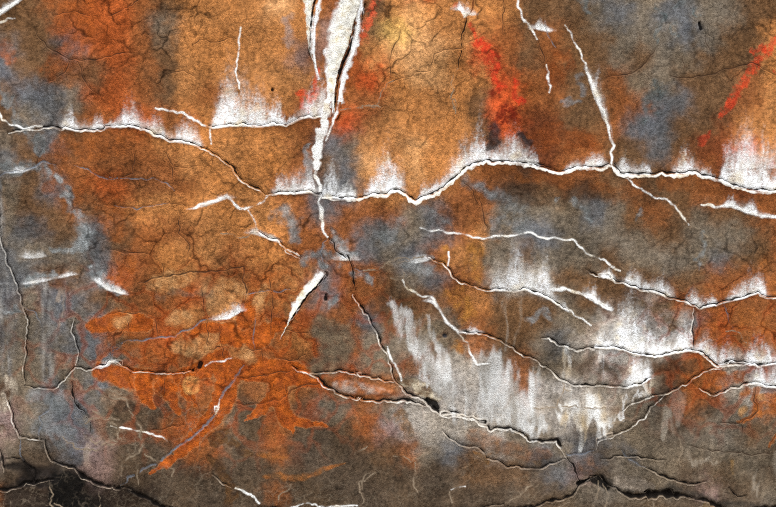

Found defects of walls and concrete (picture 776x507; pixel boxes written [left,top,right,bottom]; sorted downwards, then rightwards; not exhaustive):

water stain [0,69,179,507]
crack [0,211,245,507]
rust [82,265,330,475]
water stain [53,0,375,147]
rust [256,450,347,483]
water stain [241,201,376,321]
peeling [279,269,364,383]
peeling [302,0,364,114]
crack [0,0,776,337]
crack [211,226,776,507]
water stain [265,76,776,507]
water stain [559,48,776,220]